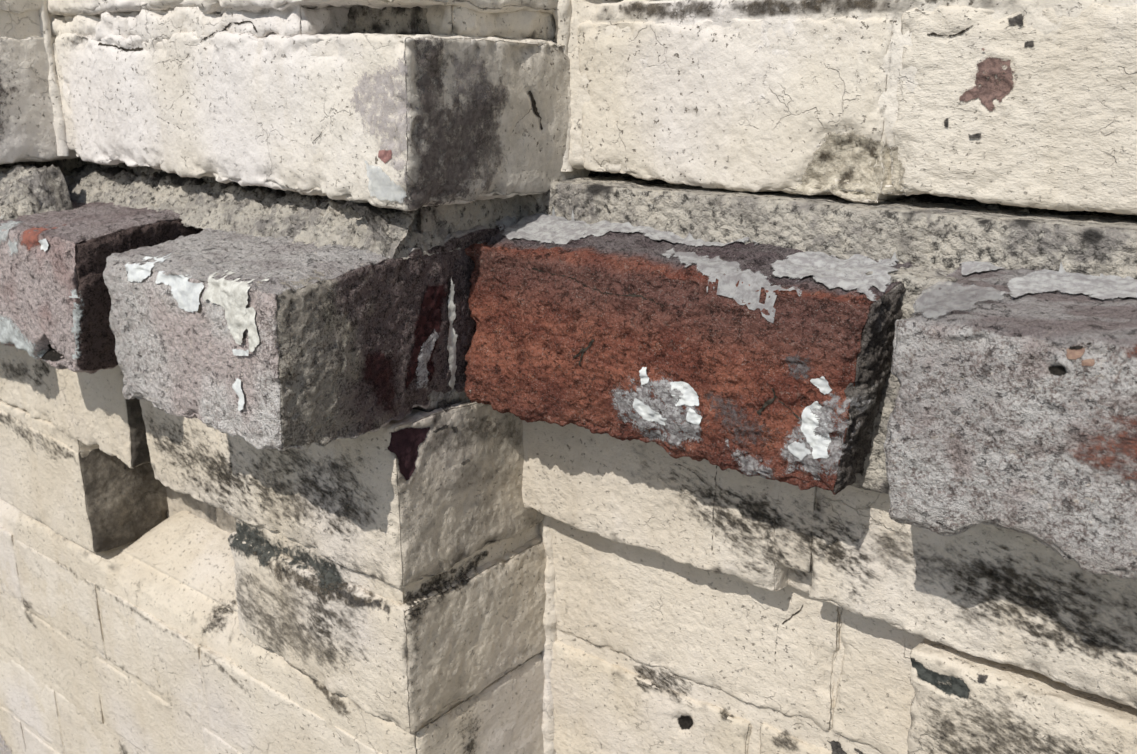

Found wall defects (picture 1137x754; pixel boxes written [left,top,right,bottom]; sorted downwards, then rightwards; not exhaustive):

crack [98,42,143,52]
crack [179,21,257,69]
crack [512,91,543,133]
peeling [125,253,338,356]
peeling [495,206,899,323]
peeling [910,261,1137,318]
peeling [612,367,703,448]
peeling [781,376,871,480]
leakage [149,420,376,540]
leakage [204,562,381,715]
leakage [957,546,1137,678]
leakage [921,699,1100,754]